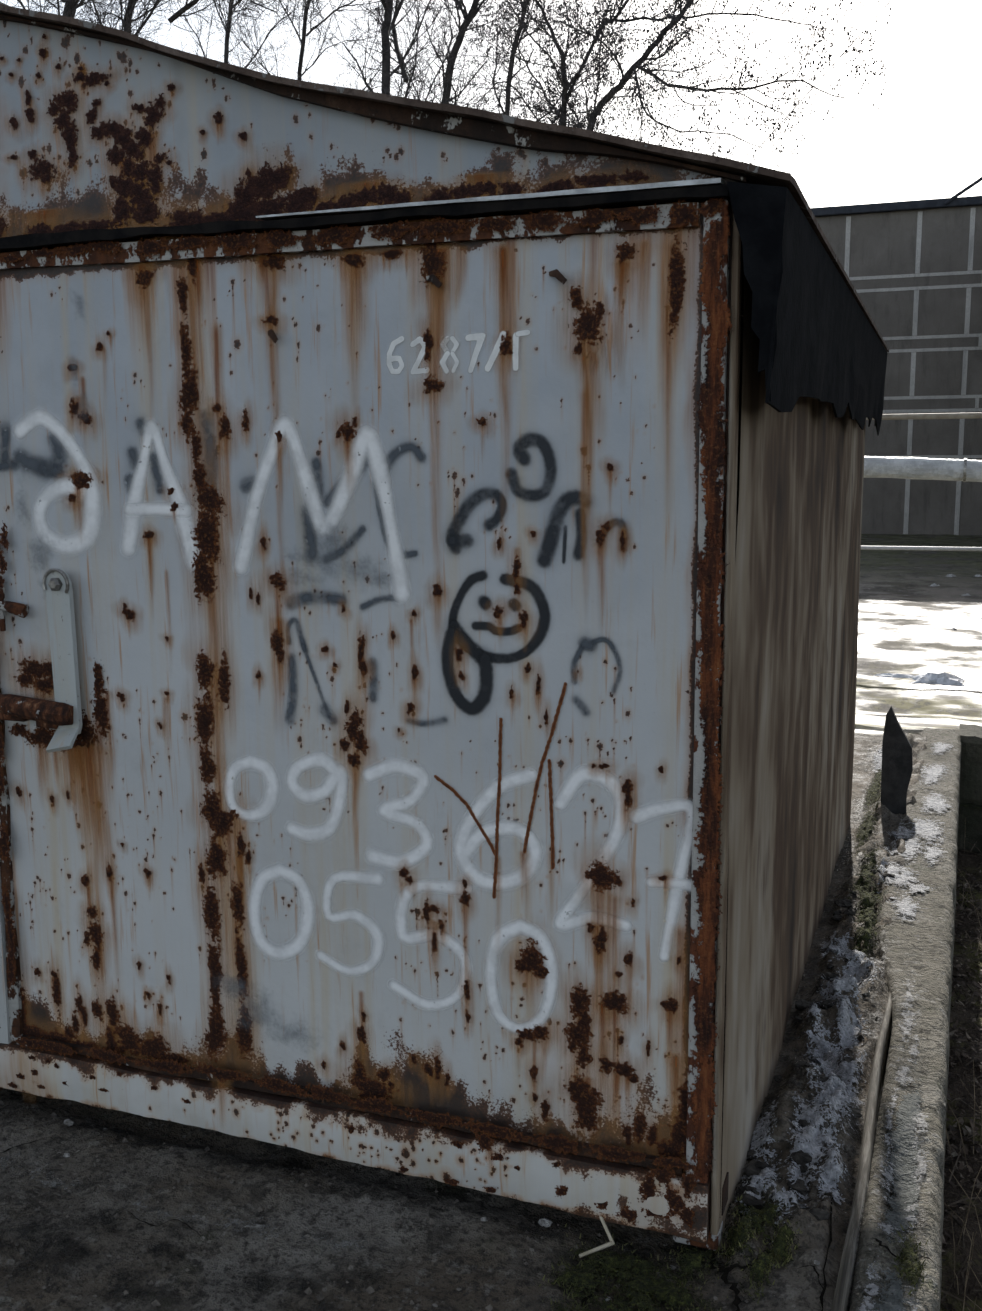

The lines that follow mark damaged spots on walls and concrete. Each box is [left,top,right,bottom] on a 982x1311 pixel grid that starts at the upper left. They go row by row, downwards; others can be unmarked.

rust [7,149,57,187]
rust [9,34,61,131]
rust [199,111,223,137]
rust [0,155,733,1229]
water stain [820,744,882,925]
water stain [859,931,890,1080]
crack [709,1258,752,1311]